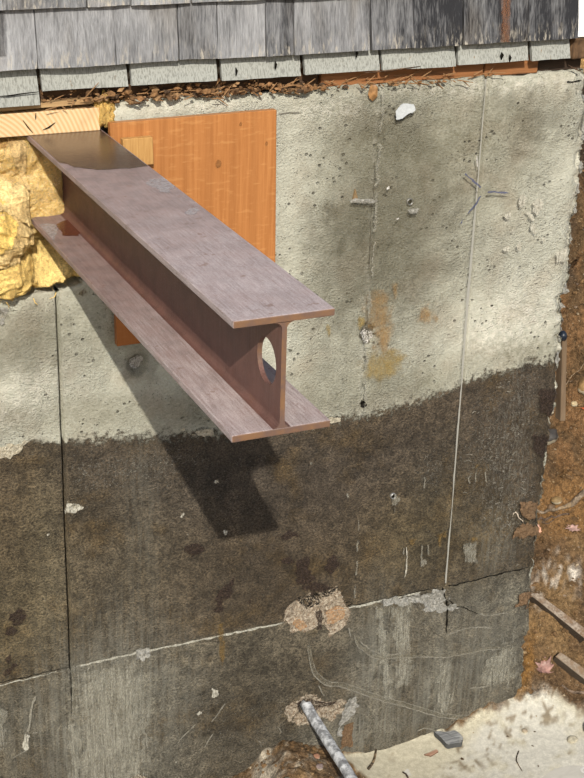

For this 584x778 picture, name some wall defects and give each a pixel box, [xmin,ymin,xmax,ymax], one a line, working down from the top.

water stain [0,354,557,778]
spalling [281,555,351,637]
spalling [284,694,359,749]